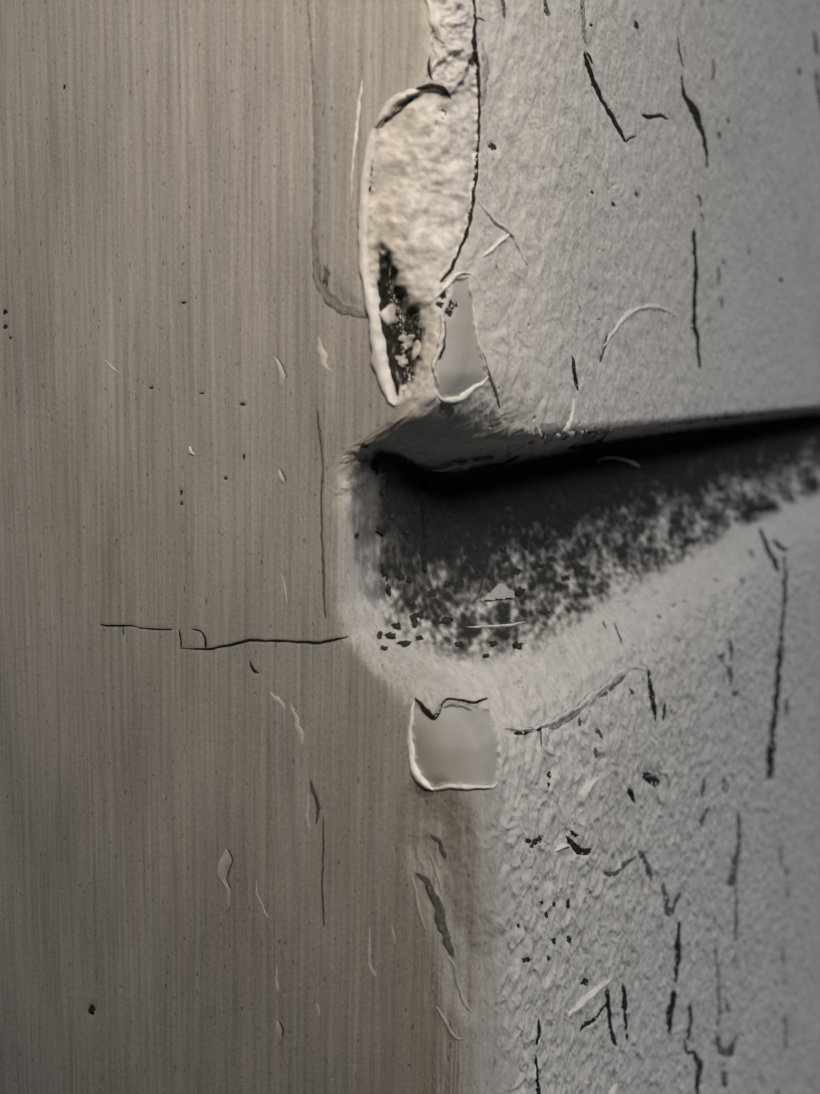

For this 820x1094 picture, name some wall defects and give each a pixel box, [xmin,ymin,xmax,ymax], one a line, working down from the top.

crack [542,0,550,15]
crack [580,0,708,168]
crack [710,58,718,80]
spalling [358,0,500,408]
crack [690,194,724,369]
crack [100,411,349,673]
crack [713,527,789,780]
spalling [407,665,648,1013]
crack [627,772,660,803]
crack [566,777,742,1094]
crack [778,844,790,898]
crack [781,1014,789,1051]